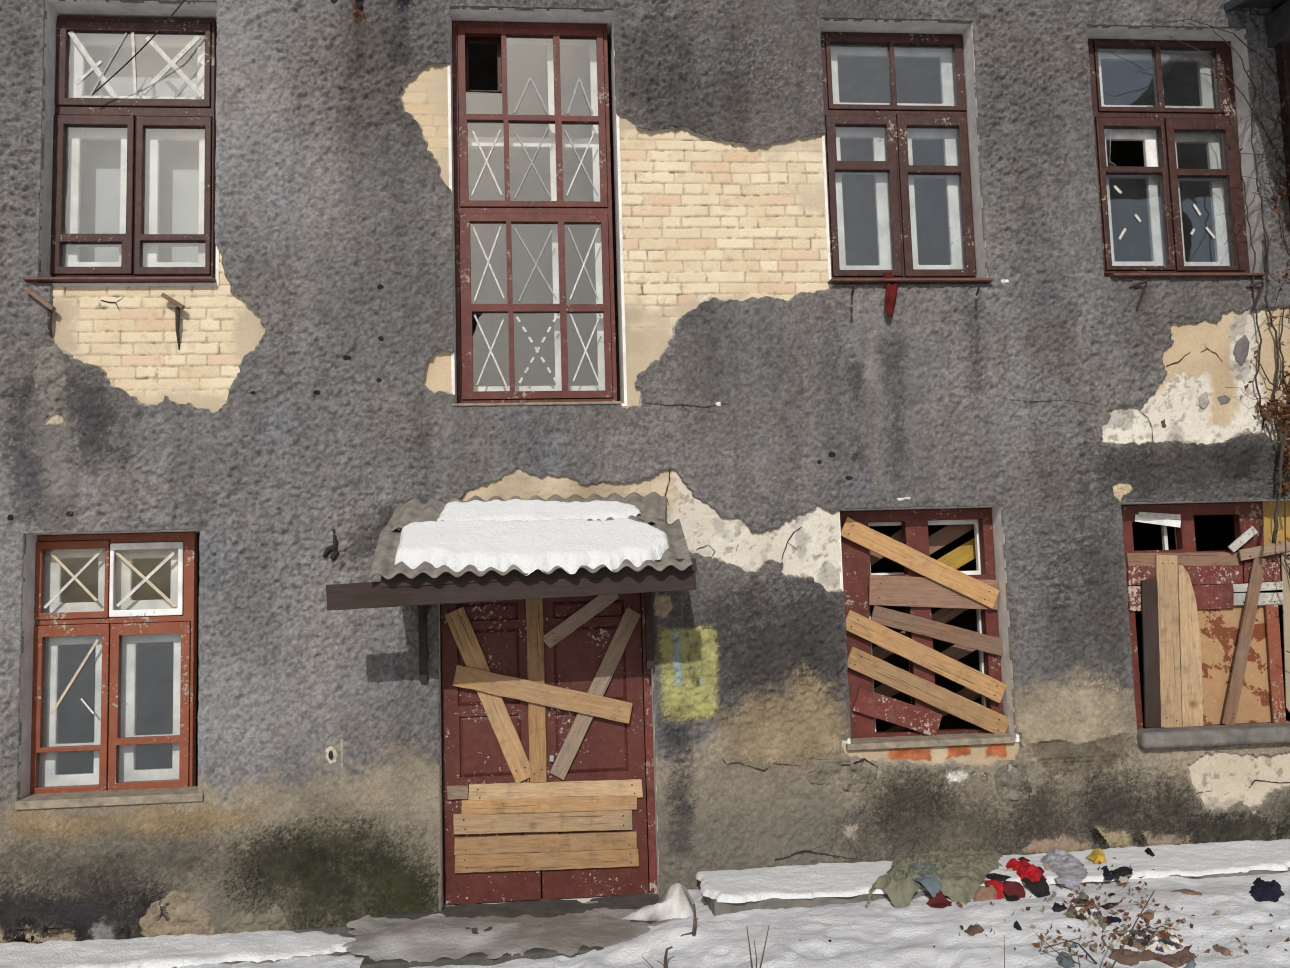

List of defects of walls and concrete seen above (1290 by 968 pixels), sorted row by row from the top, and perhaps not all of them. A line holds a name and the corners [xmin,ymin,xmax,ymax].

flaking render [400,62,449,187]
flaking render [618,113,834,409]
flaking render [49,246,265,413]
peeling [423,350,453,395]
spalling [1101,305,1290,445]
spalling [459,468,842,592]
damp [849,768,1290,858]
spalling [1187,751,1290,815]
damp [0,840,253,944]